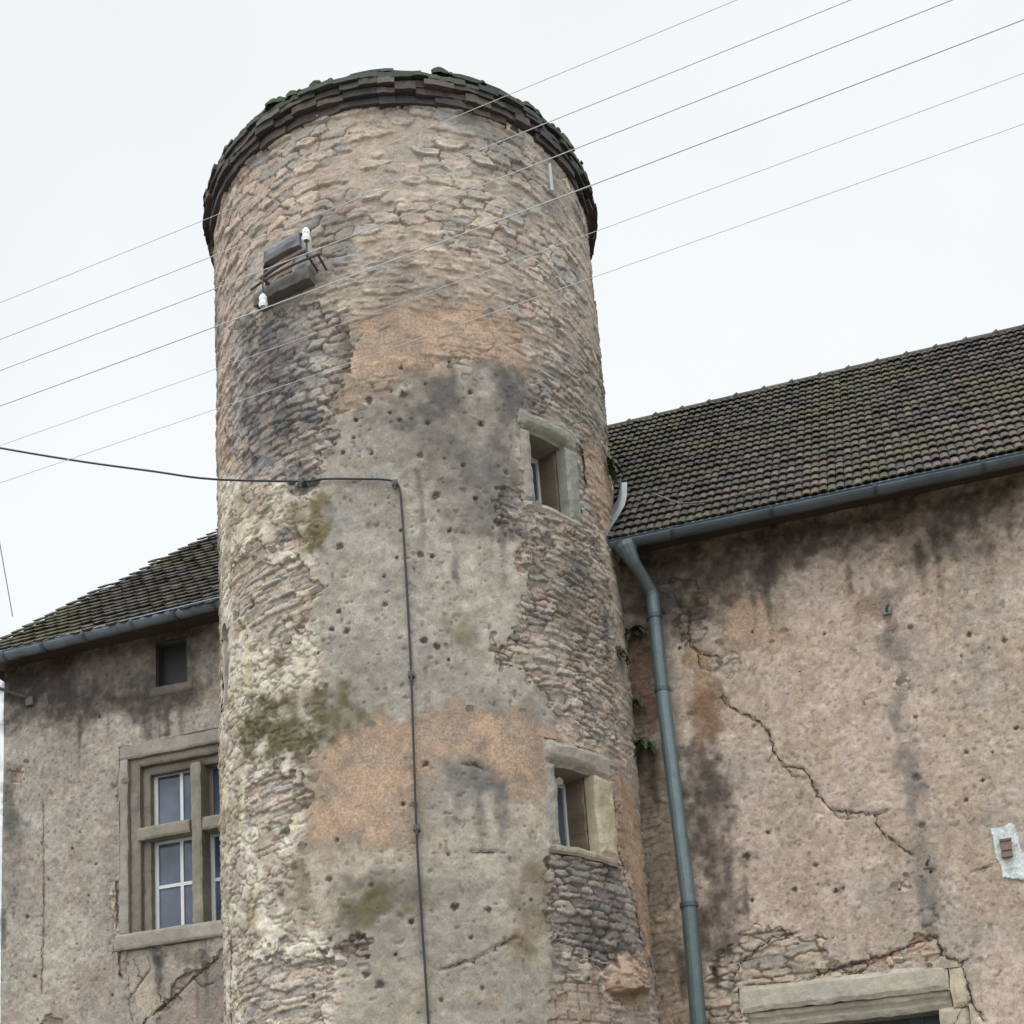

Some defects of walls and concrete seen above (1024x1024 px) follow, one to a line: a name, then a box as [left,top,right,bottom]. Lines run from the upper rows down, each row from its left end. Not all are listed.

spalling [225,300,534,501]
damp [407,376,458,426]
flaking render [228,438,622,853]
crack [673,595,721,671]
crack [722,696,911,854]
crack [113,936,233,1024]
spalling [122,933,384,1024]
crack [440,942,508,970]
spalling [538,772,654,1024]
damp [682,743,741,953]
spalling [703,903,946,1024]